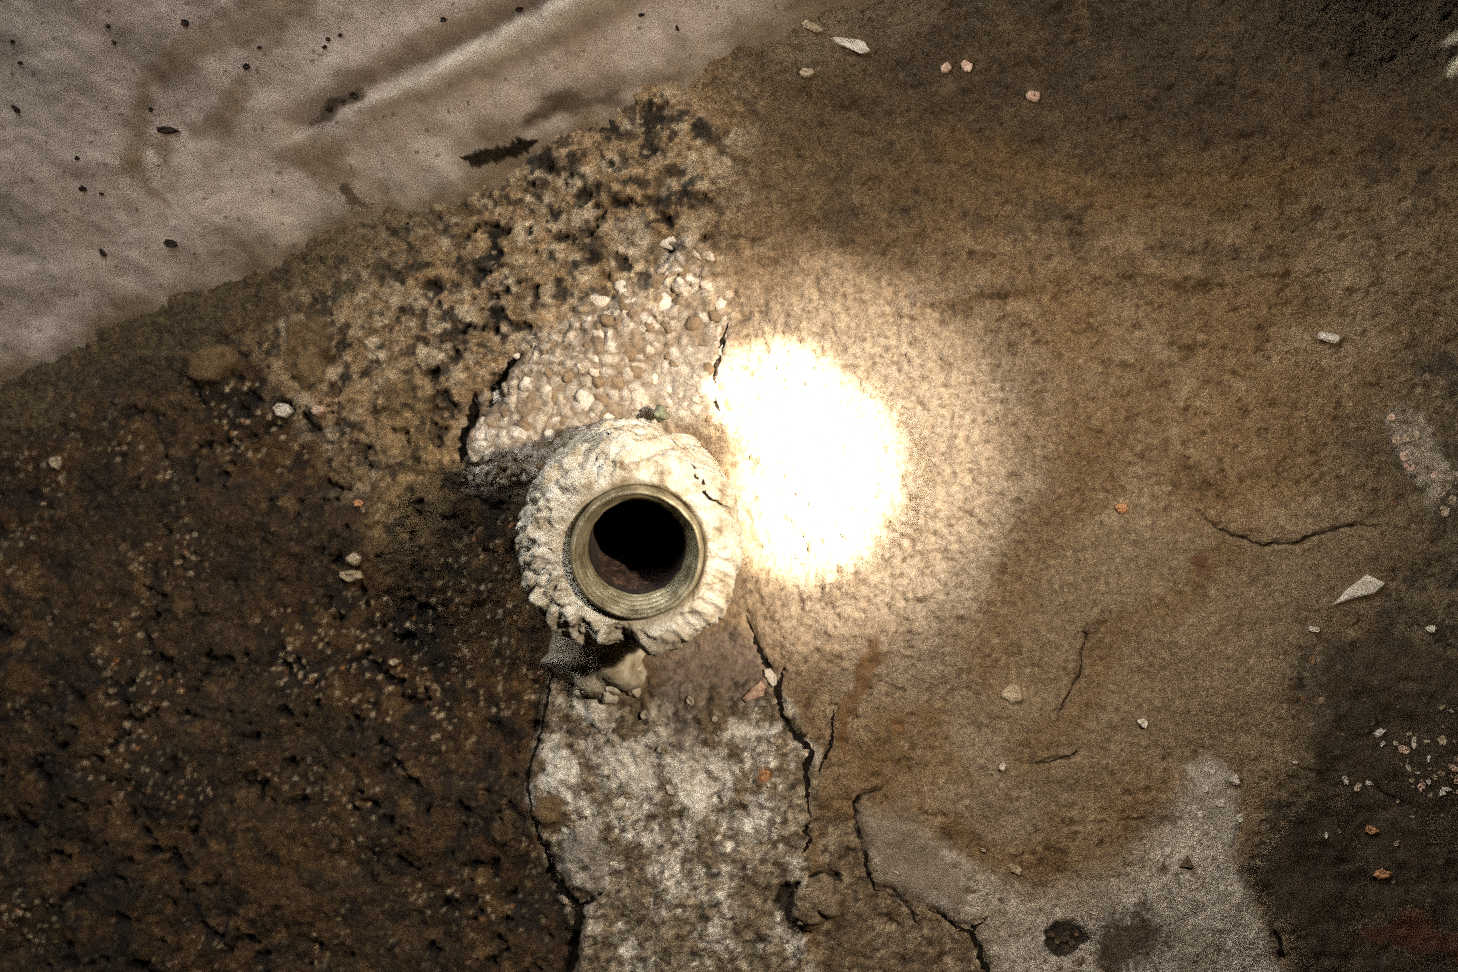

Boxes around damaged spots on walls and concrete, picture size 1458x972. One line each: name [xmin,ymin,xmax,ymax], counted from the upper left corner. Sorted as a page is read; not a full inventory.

spalling [659,236,676,250]
spalling [48,457,62,470]
spalling [272,403,326,418]
spalling [339,553,364,583]
spalling [475,250,734,482]
crack [1197,513,1387,546]
crack [525,672,603,972]
peeling [536,749,609,891]
peeling [573,668,781,845]
crack [746,615,835,853]
crack [852,789,990,972]